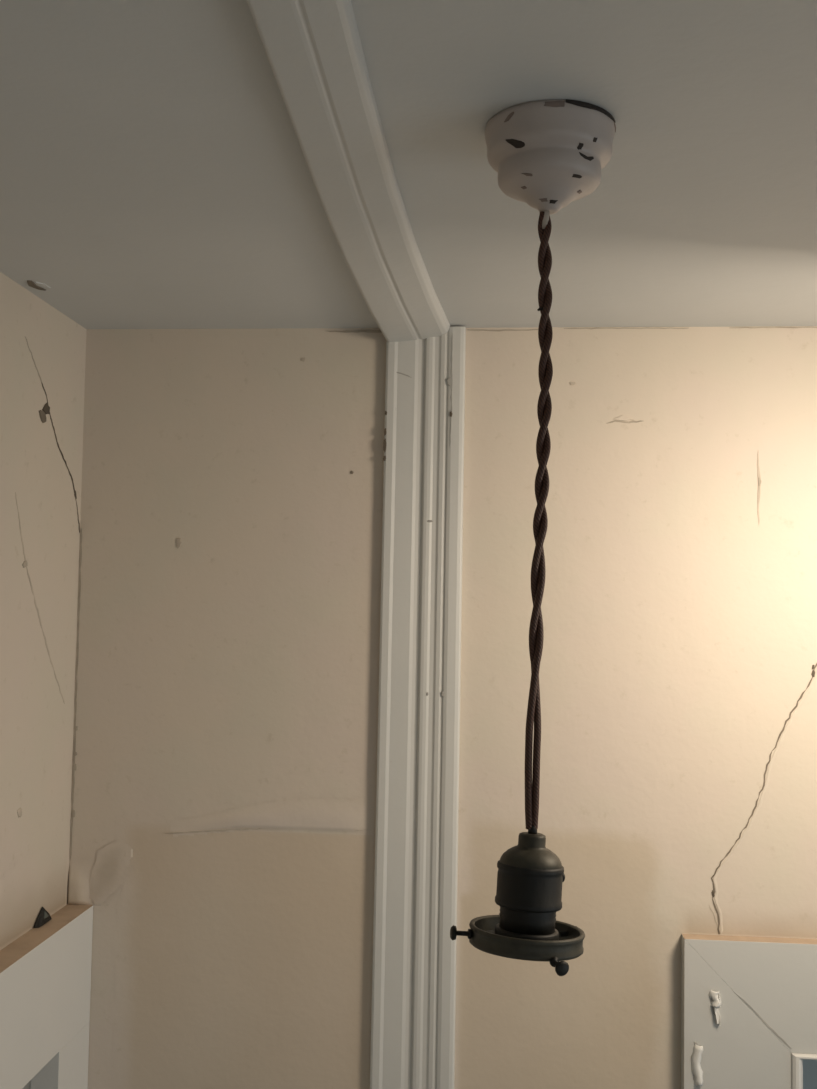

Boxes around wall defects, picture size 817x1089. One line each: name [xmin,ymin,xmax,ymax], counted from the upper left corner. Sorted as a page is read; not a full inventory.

crack [15,337,83,858]
crack [709,663,817,934]